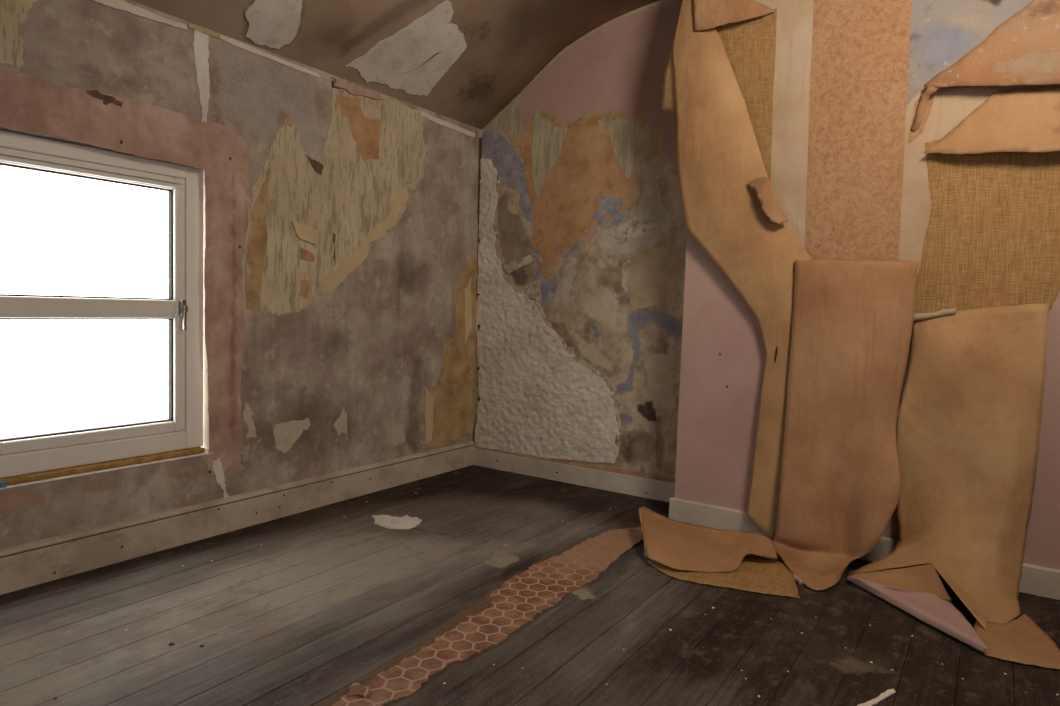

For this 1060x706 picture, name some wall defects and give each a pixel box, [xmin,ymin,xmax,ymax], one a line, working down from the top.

flaking render [0,68,257,475]
peeling [273,418,311,453]
peeling [334,408,348,442]
flaking render [465,128,683,464]
peeling [715,0,1060,314]